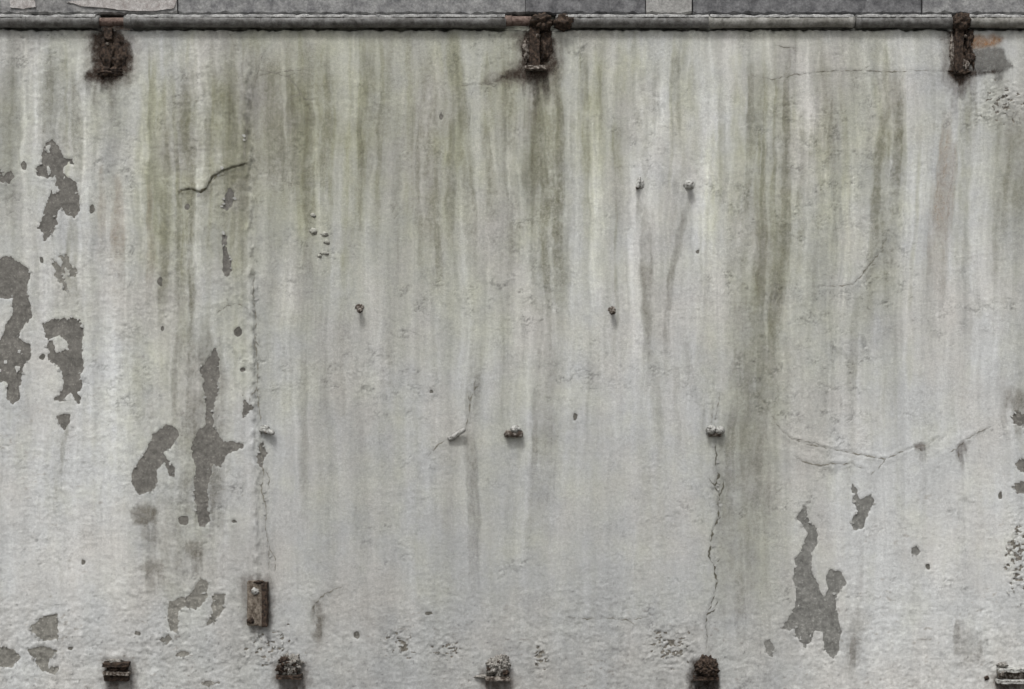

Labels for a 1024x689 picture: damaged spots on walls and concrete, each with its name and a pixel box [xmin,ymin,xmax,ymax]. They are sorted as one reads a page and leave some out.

rust [84,16,133,84]
rust [501,32,557,80]
damp [969,48,1013,78]
crack [178,48,314,197]
peeling [0,139,95,241]
peeling [0,254,85,430]
peeling [131,424,179,495]
crack [759,394,989,475]
crack [705,393,724,648]
peeling [781,506,847,659]
rust [275,656,302,688]
rust [689,658,720,689]